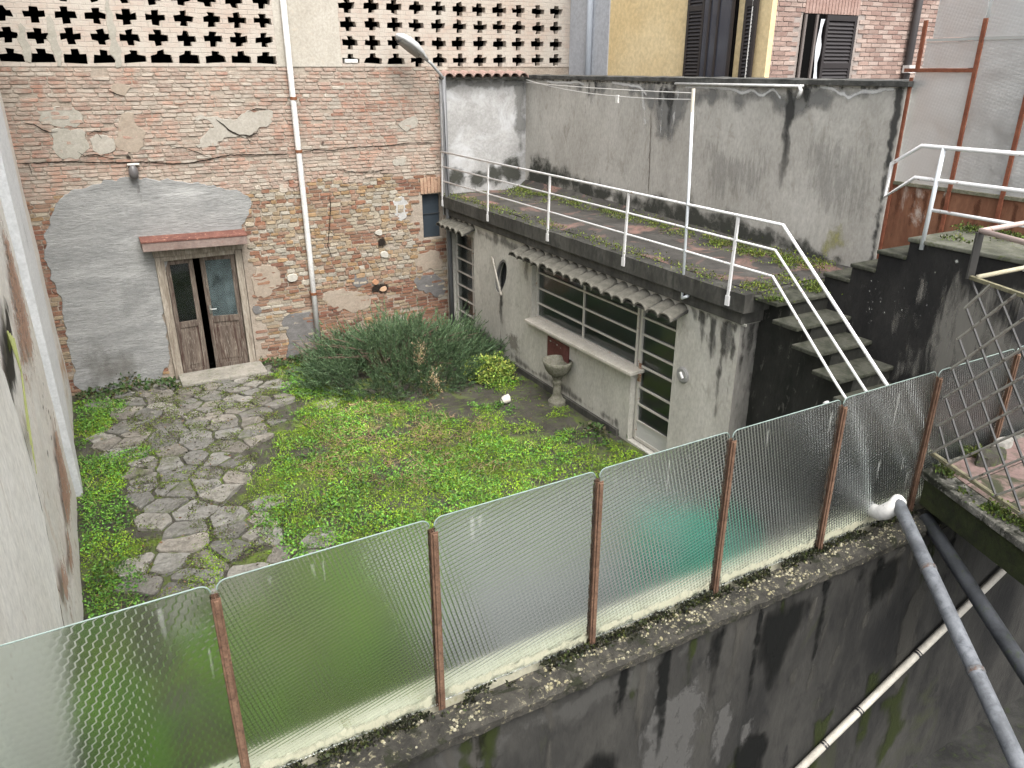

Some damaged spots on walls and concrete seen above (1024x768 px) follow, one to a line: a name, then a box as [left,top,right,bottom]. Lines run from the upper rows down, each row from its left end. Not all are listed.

crack [19,108,433,174]
water stain [446,79,903,263]
rust [896,189,928,219]
water stain [692,307,759,382]
water stain [863,545,914,627]
water stain [710,630,724,665]
water stain [734,580,831,691]
water stain [857,587,926,762]
water stain [435,726,511,768]
water stain [815,711,833,747]